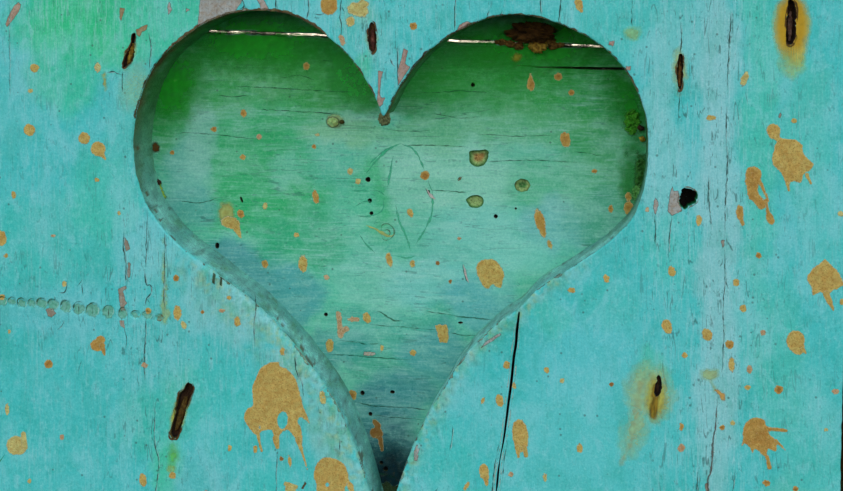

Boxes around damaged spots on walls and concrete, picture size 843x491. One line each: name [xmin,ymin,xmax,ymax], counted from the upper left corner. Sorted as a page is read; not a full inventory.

peeling [162,0,327,55]
rust [774,0,809,72]
peeling [668,186,682,215]
peeling [118,262,131,328]
rust [631,373,667,433]